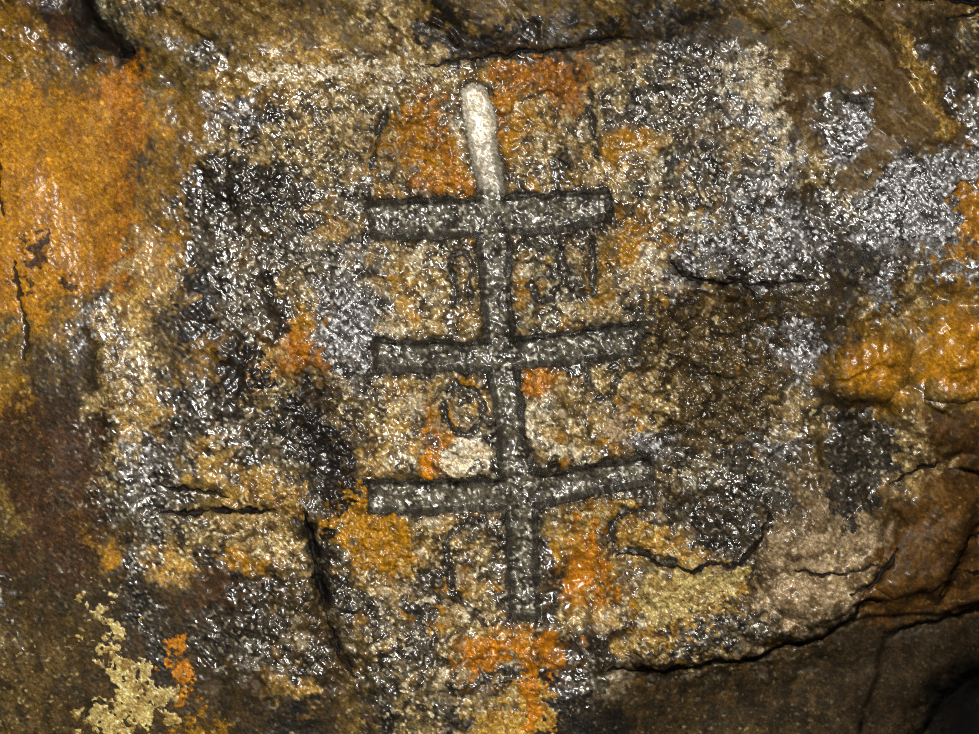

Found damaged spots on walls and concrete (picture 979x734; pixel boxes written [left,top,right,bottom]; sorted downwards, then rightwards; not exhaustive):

crack [918,0,979,20]
crack [0,177,8,216]
crack [13,260,30,361]
crack [145,482,277,517]
crack [889,461,979,485]
crack [303,511,359,678]
crack [607,548,898,674]
crack [881,532,979,639]